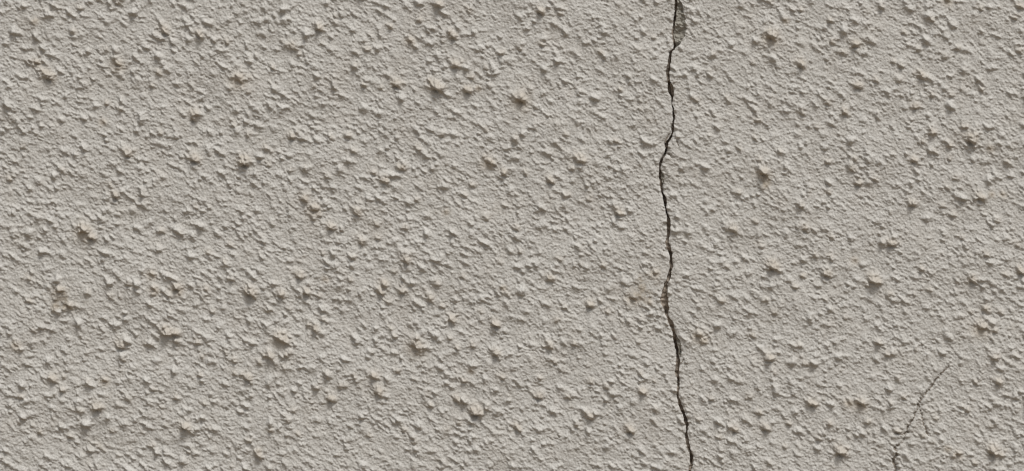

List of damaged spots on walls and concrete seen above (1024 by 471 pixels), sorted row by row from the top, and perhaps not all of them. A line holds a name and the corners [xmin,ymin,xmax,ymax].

crack [659,0,693,471]